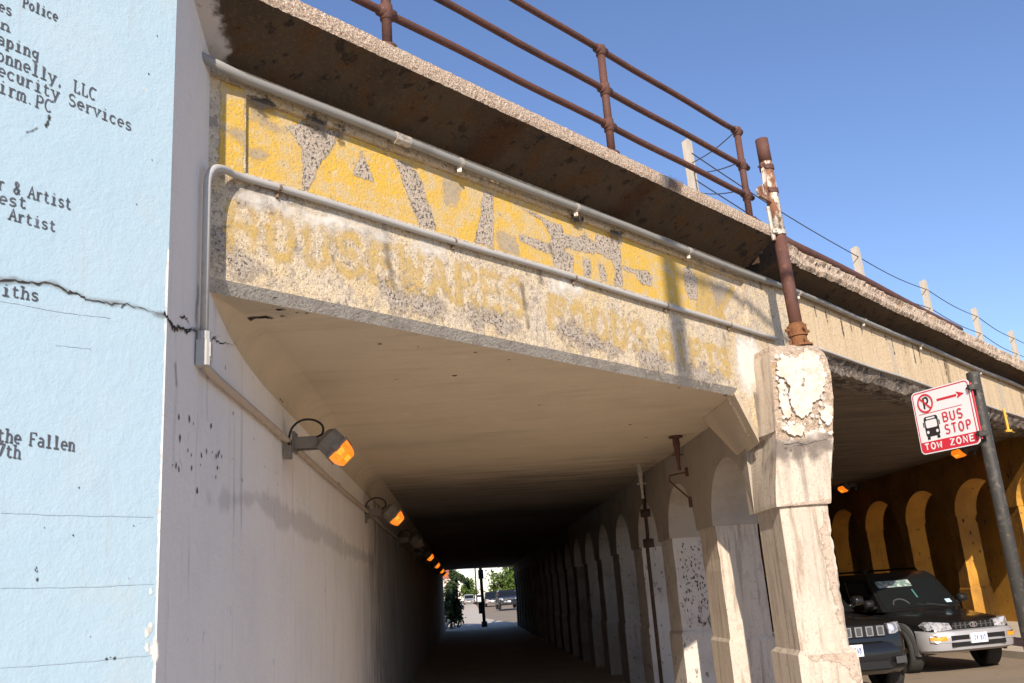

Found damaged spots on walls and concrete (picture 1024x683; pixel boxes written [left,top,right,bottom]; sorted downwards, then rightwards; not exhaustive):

crack [0,279,235,346]
peeling [378,277,447,320]
peeling [468,302,521,335]
peeling [555,317,670,375]
peeling [775,342,833,451]